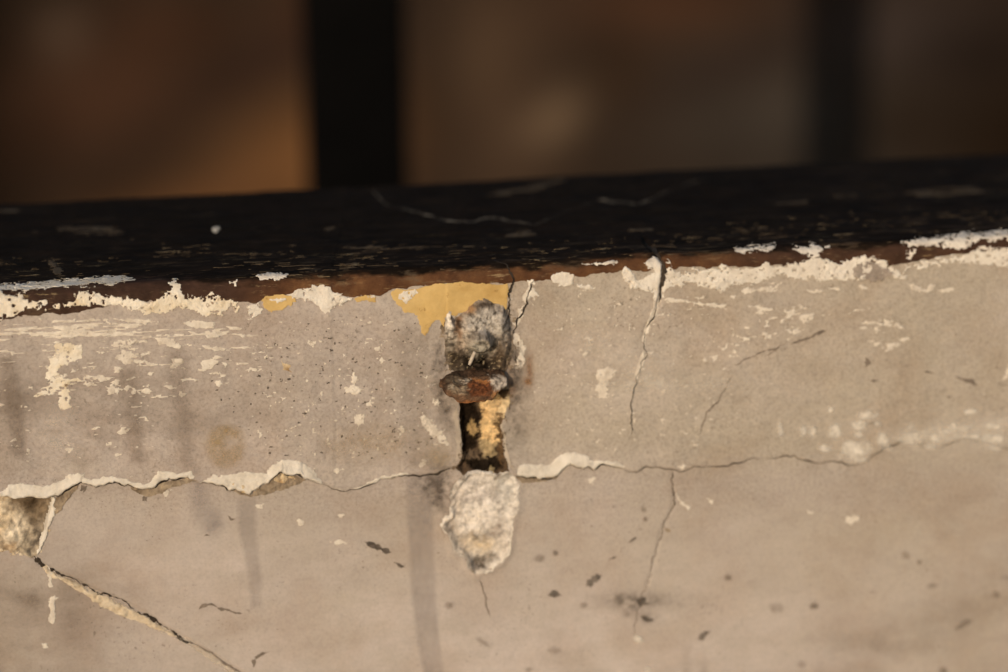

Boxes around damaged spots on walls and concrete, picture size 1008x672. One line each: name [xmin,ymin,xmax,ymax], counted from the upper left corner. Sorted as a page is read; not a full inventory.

peeling [33,343,83,410]
peeling [110,338,139,394]
peeling [155,331,240,413]
peeling [238,330,295,454]
peeling [391,281,509,350]
crack [630,243,667,431]
crack [700,329,827,434]
spalling [0,496,56,558]
crack [0,460,453,514]
spalling [303,331,521,575]
crack [516,438,1008,636]
crack [34,556,240,672]